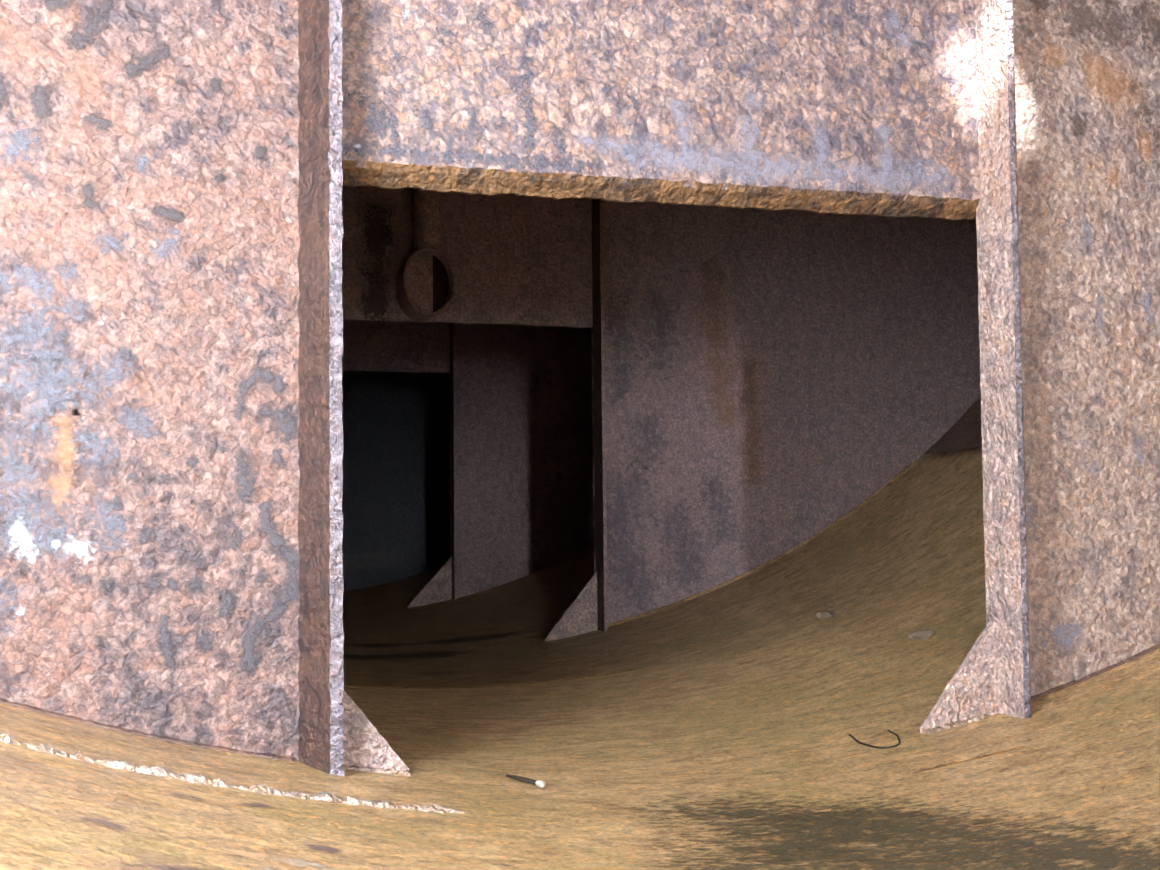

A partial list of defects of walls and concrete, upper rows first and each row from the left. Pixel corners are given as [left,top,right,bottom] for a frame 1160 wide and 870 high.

water stain [0,119,42,168]
water stain [344,204,395,327]
water stain [0,258,136,573]